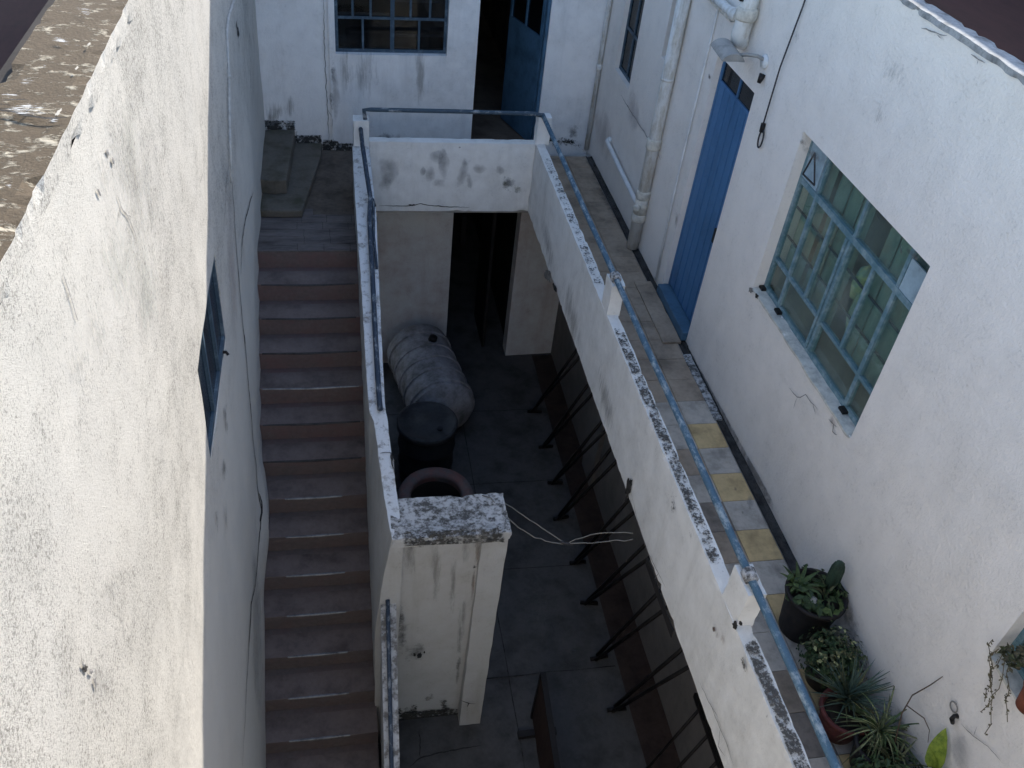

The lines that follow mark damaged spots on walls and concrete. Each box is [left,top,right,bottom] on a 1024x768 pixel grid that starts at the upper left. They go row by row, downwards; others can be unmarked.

crack [200,154,263,746]
peeling [615,330,720,563]
peeling [745,640,810,768]